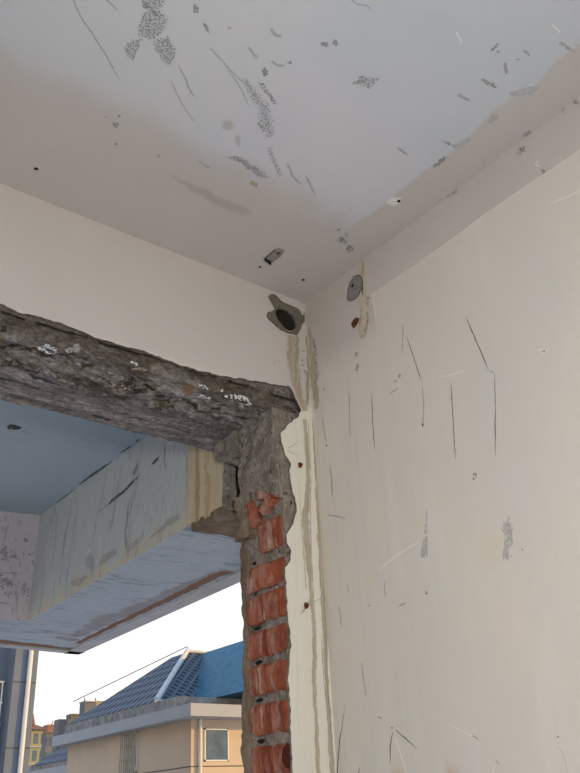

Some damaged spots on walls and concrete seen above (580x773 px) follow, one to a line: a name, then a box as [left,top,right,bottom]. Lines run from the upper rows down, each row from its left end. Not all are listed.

crack [401,324,424,429]
crack [465,316,496,455]
spalling [477,516,523,573]